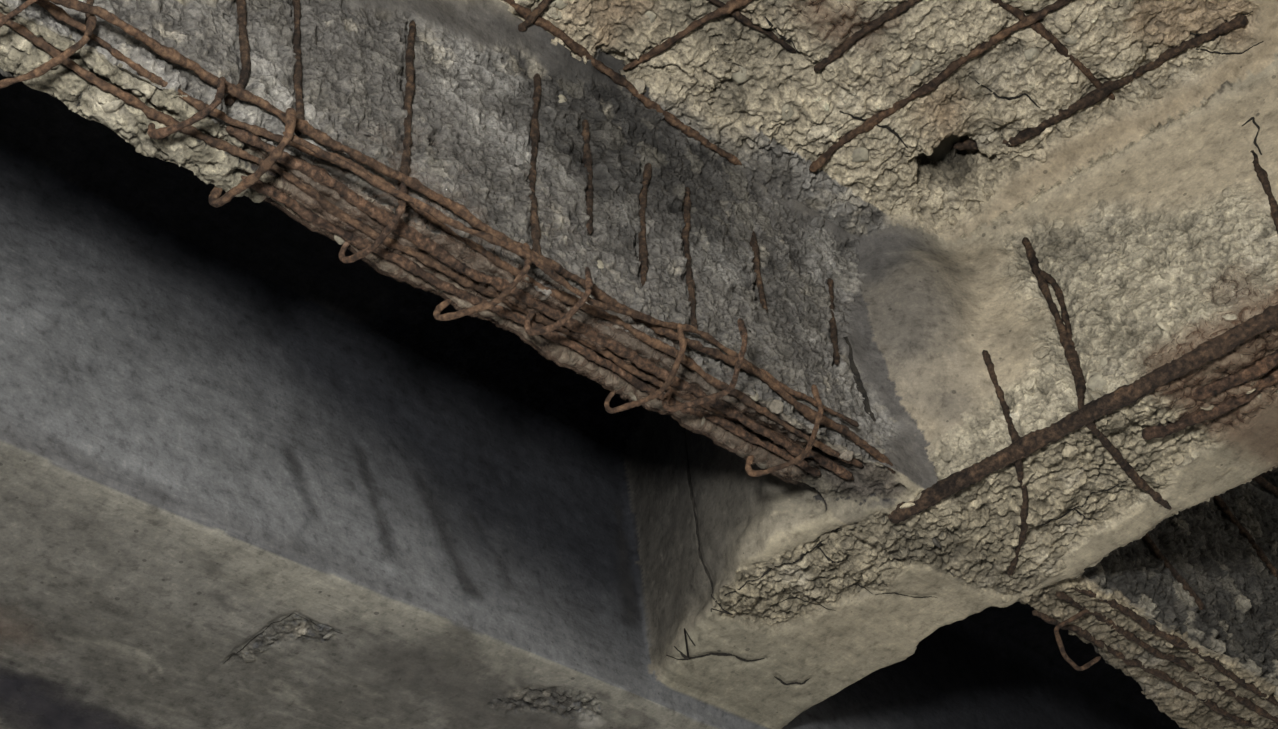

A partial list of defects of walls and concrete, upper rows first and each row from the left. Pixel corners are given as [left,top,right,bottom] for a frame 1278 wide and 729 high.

spalling [0,0,1255,454]
spalling [929,187,1278,481]
spalling [227,615,338,662]
crack [666,628,810,685]
crack [684,424,937,615]
spalling [478,309,1278,729]